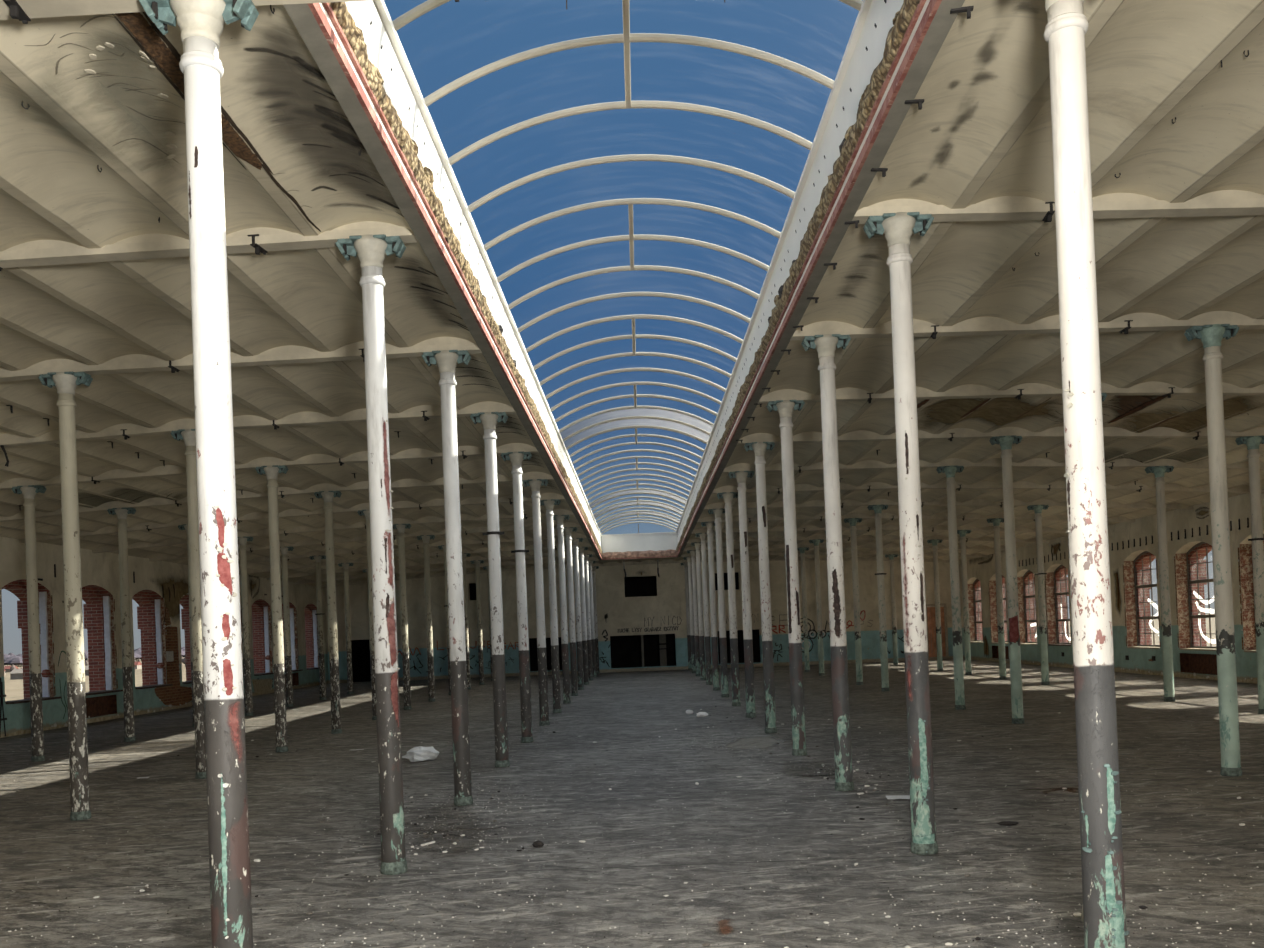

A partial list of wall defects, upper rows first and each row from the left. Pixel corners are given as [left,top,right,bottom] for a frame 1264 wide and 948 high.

water stain [84,39,177,159]
water stain [245,35,404,217]
peeling [381,420,401,734]
peeling [832,569,841,637]
peeling [903,511,926,646]
flaking render [1114,565,1218,680]
peeling [218,773,230,939]
peeling [1081,764,1129,948]